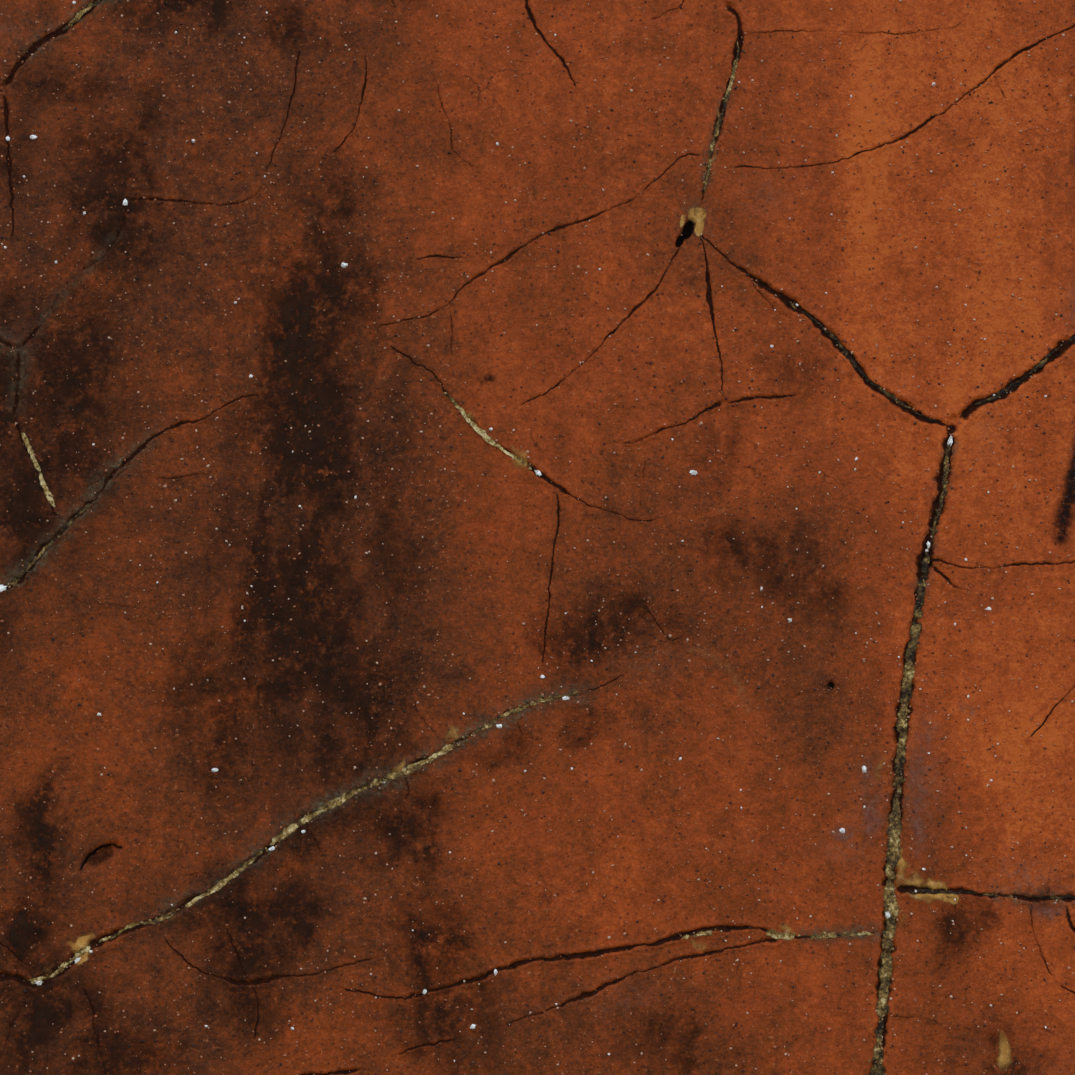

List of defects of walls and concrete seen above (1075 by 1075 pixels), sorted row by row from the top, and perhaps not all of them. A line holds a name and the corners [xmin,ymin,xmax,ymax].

crack [3,0,107,236]
crack [267,51,301,168]
crack [336,58,367,150]
crack [110,194,256,247]
crack [380,0,1075,663]
leakage [0,325,110,568]
leakage [235,227,393,770]
leakage [1056,452,1075,543]
crack [0,235,1075,1075]
leakage [22,783,57,888]
leakage [2,901,49,960]
leakage [188,875,319,1020]